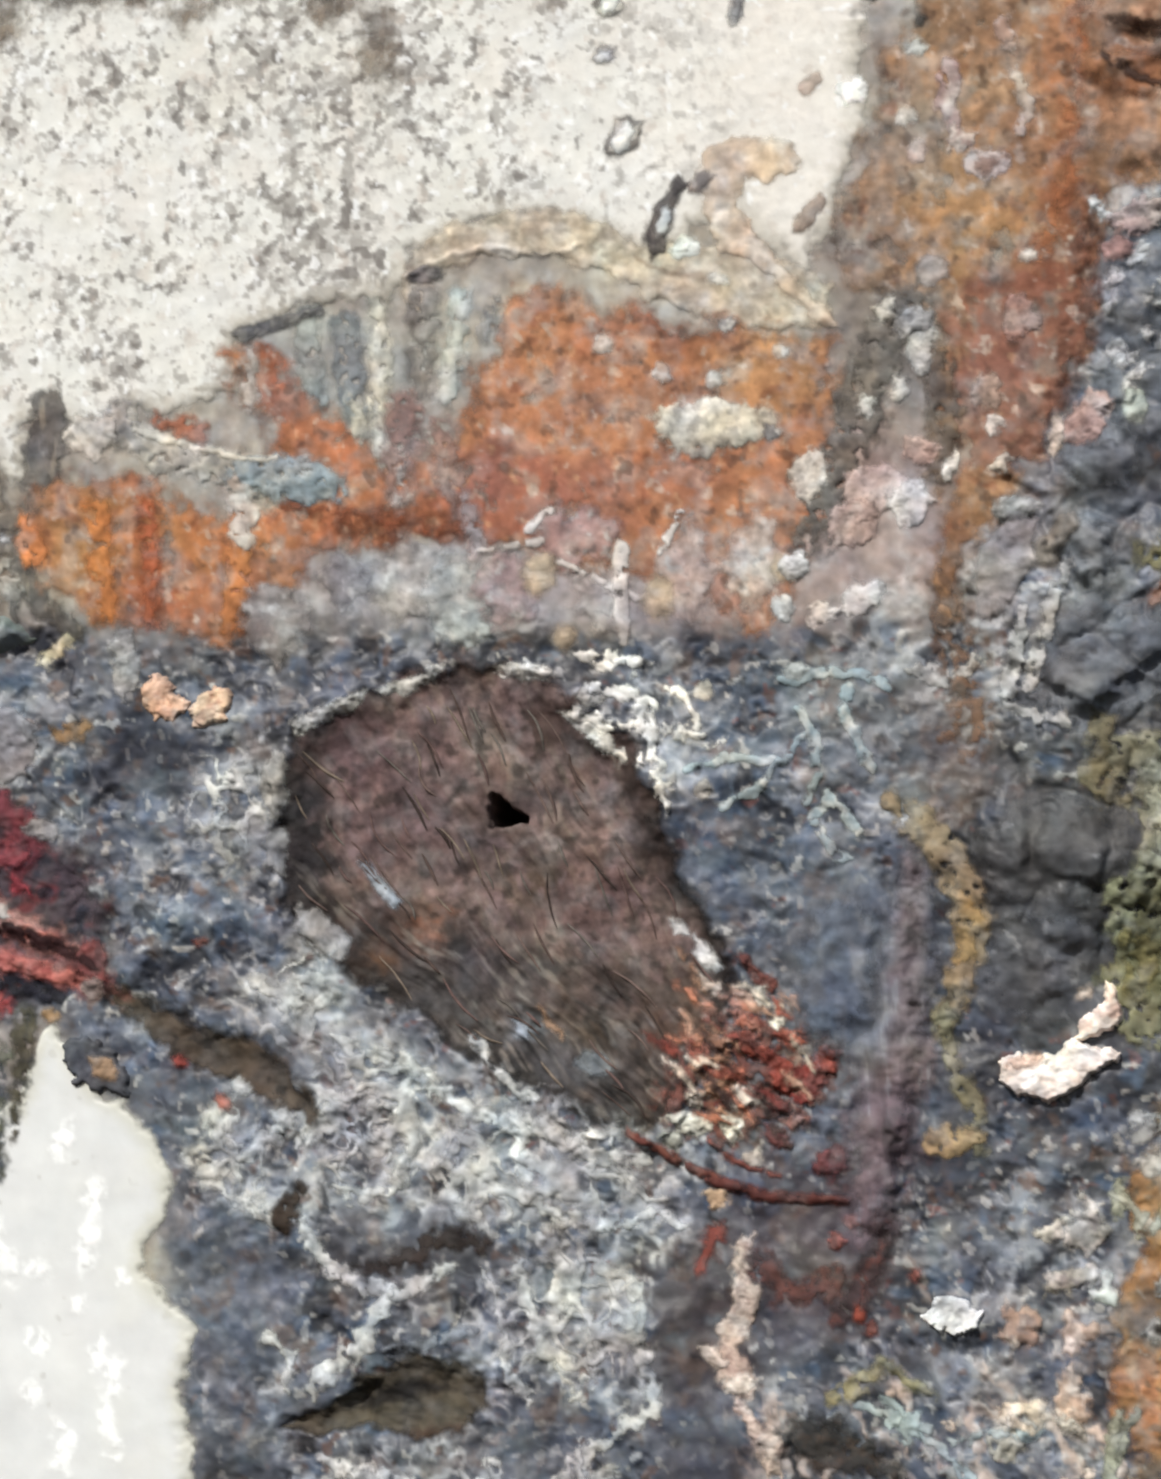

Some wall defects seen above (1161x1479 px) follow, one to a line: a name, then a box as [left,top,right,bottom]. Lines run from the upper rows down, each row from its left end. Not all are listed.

peeling [604,116,643,156]
peeling [727,0,743,26]
peeling [63,413,117,462]
rust [15,282,846,647]
peeling [231,136,837,571]
spalling [771,284,1004,628]
rust [831,0,1161,622]
spalling [989,452,1014,472]
spalling [1003,293,1042,342]
rust [62,1034,131,1098]
spalling [259,646,843,1149]
rust [1102,1104,1161,1479]